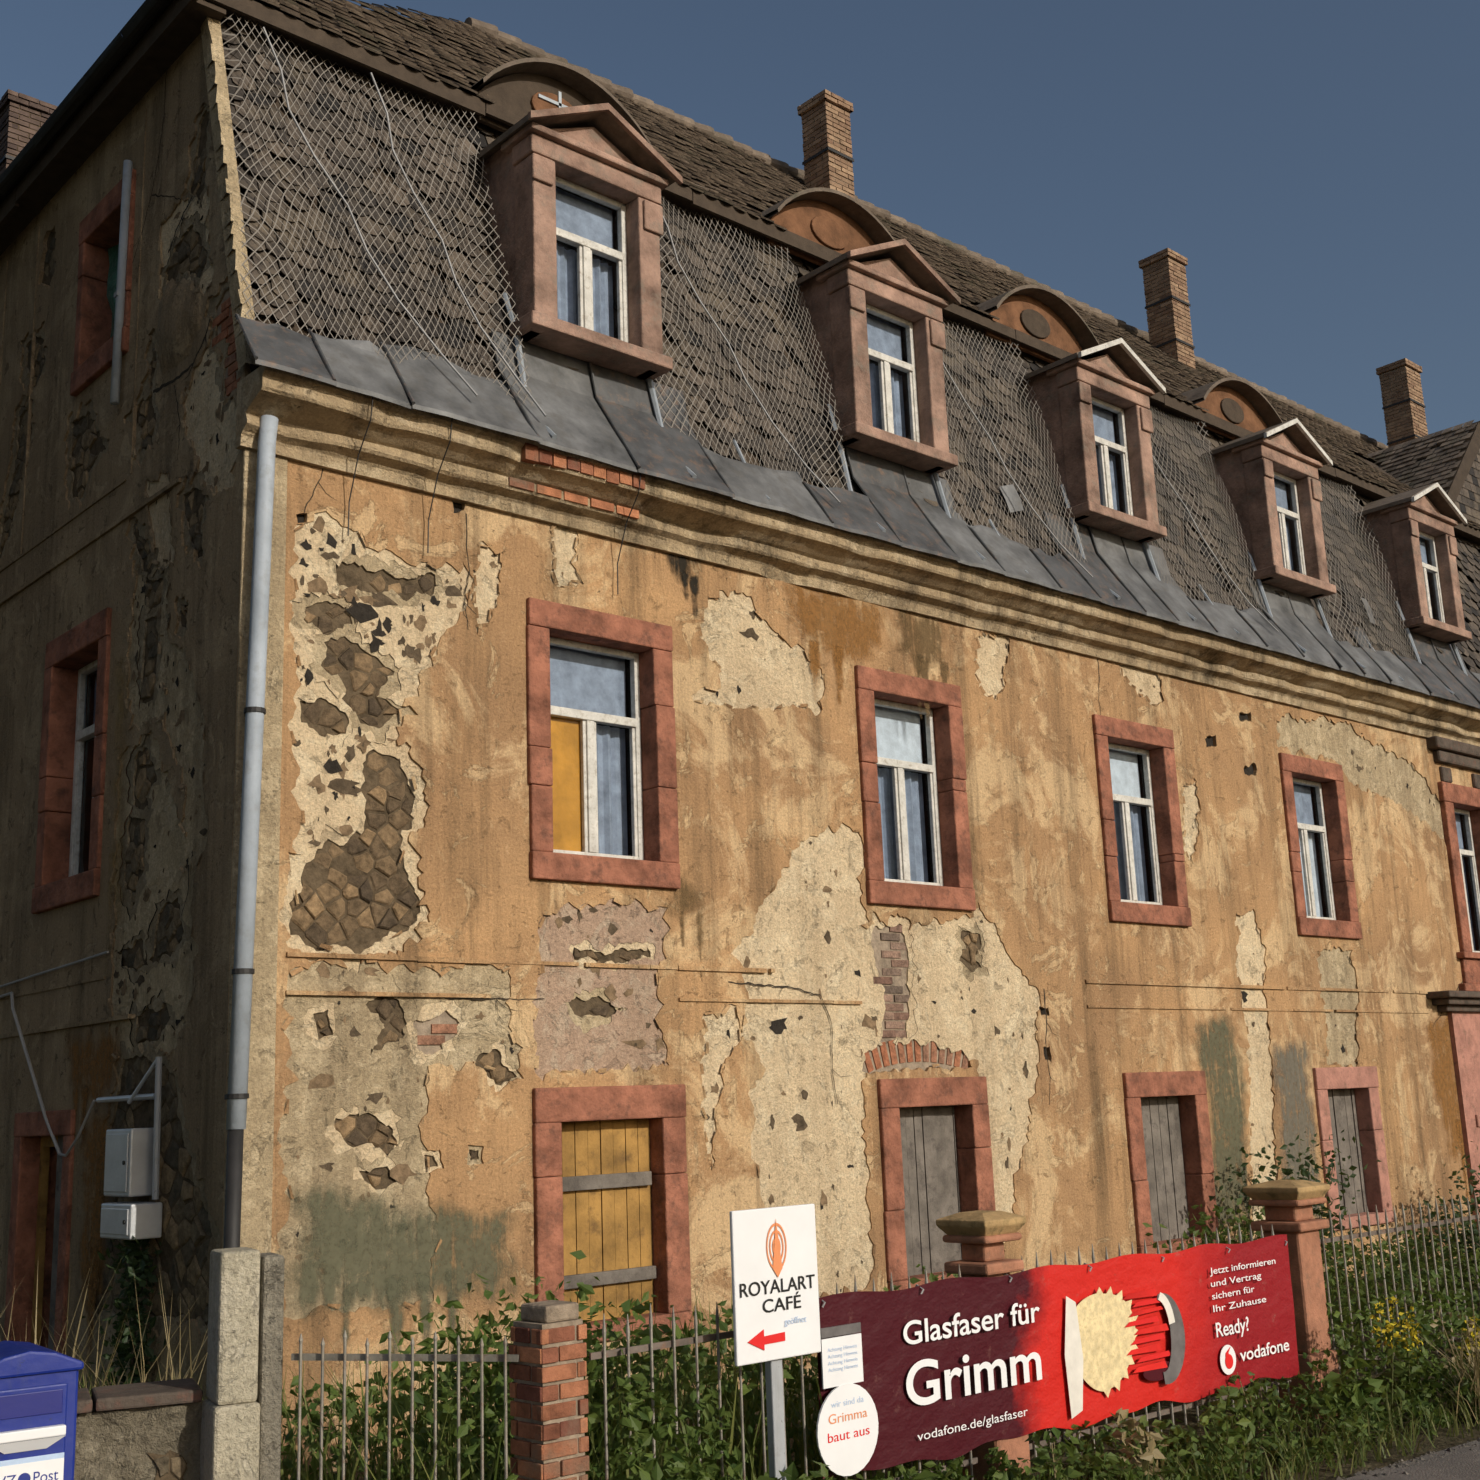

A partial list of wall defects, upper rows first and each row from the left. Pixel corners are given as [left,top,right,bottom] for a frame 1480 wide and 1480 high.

flaking render [0,322,48,559]
flaking render [65,400,109,506]
flaking render [89,104,245,1336]
flaking render [691,590,825,716]
flaking render [276,511,672,1320]
flaking render [700,823,1040,1296]
flaking render [1235,910,1279,1221]